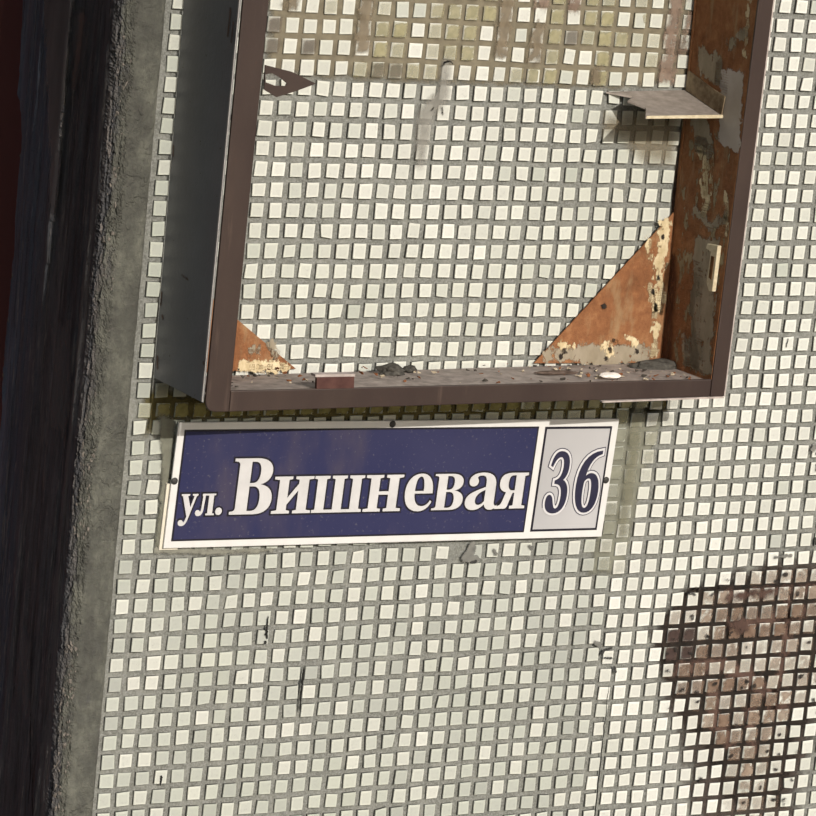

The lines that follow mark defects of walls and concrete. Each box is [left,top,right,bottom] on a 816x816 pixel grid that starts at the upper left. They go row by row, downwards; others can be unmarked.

corrosion [662,255,676,360]
corrosion [655,555,816,816]
crack [594,690,609,816]